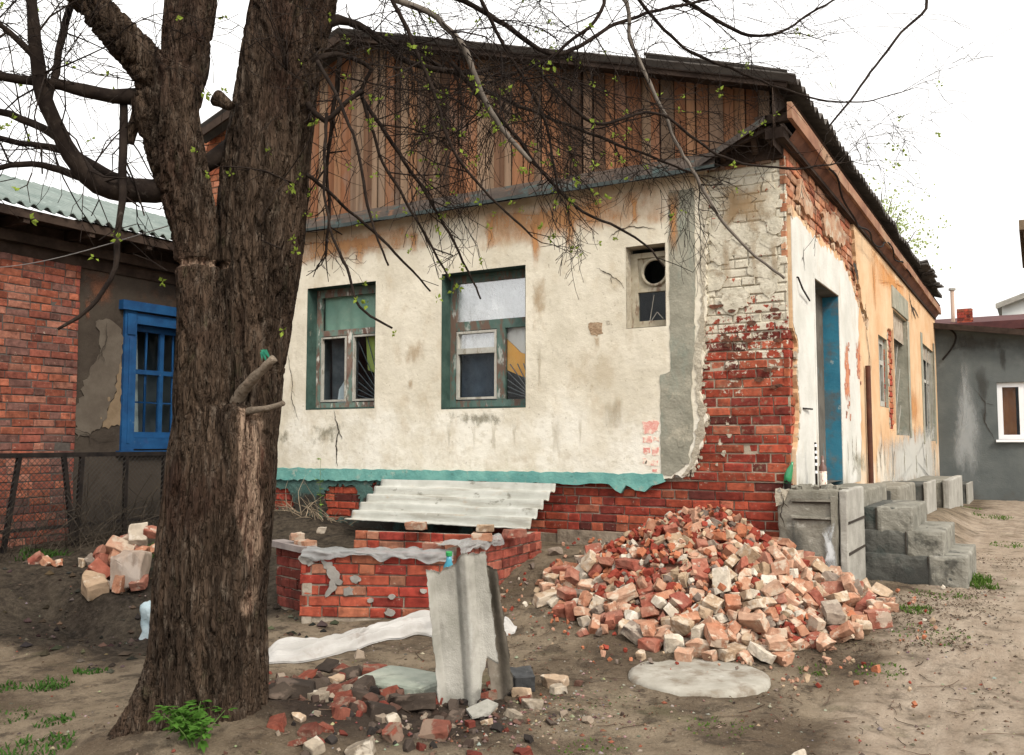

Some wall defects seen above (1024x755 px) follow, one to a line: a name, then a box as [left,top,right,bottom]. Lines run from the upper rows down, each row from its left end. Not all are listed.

rust [304,228,417,259]
rust [487,199,637,254]
flaking render [588,320,610,336]
flaking render [681,149,869,506]
peeling [75,319,124,439]
crack [334,412,342,466]
flaking render [324,481,381,520]